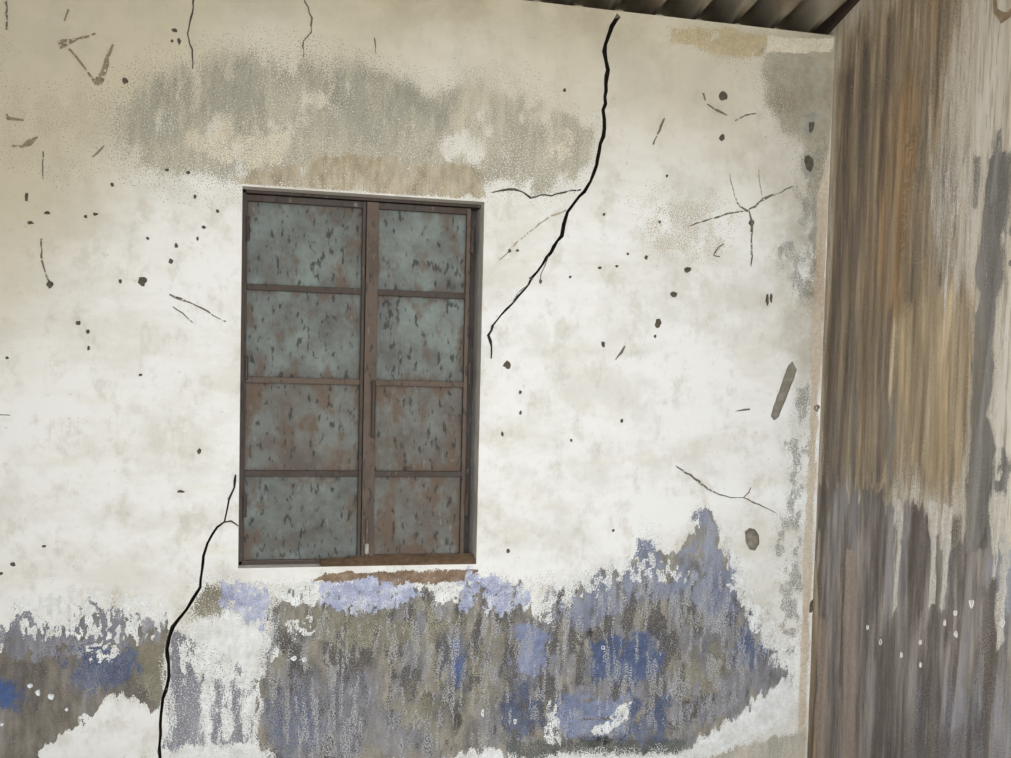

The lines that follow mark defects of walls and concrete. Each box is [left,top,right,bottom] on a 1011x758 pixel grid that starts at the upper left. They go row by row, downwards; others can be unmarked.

water stain [0,39,596,199]
crack [487,16,620,359]
crack [683,173,793,266]
peeling [0,142,830,758]
crack [676,466,775,513]
water stain [534,130,1011,758]
crack [157,475,239,758]
water stain [166,738,266,758]
water stain [456,747,522,758]